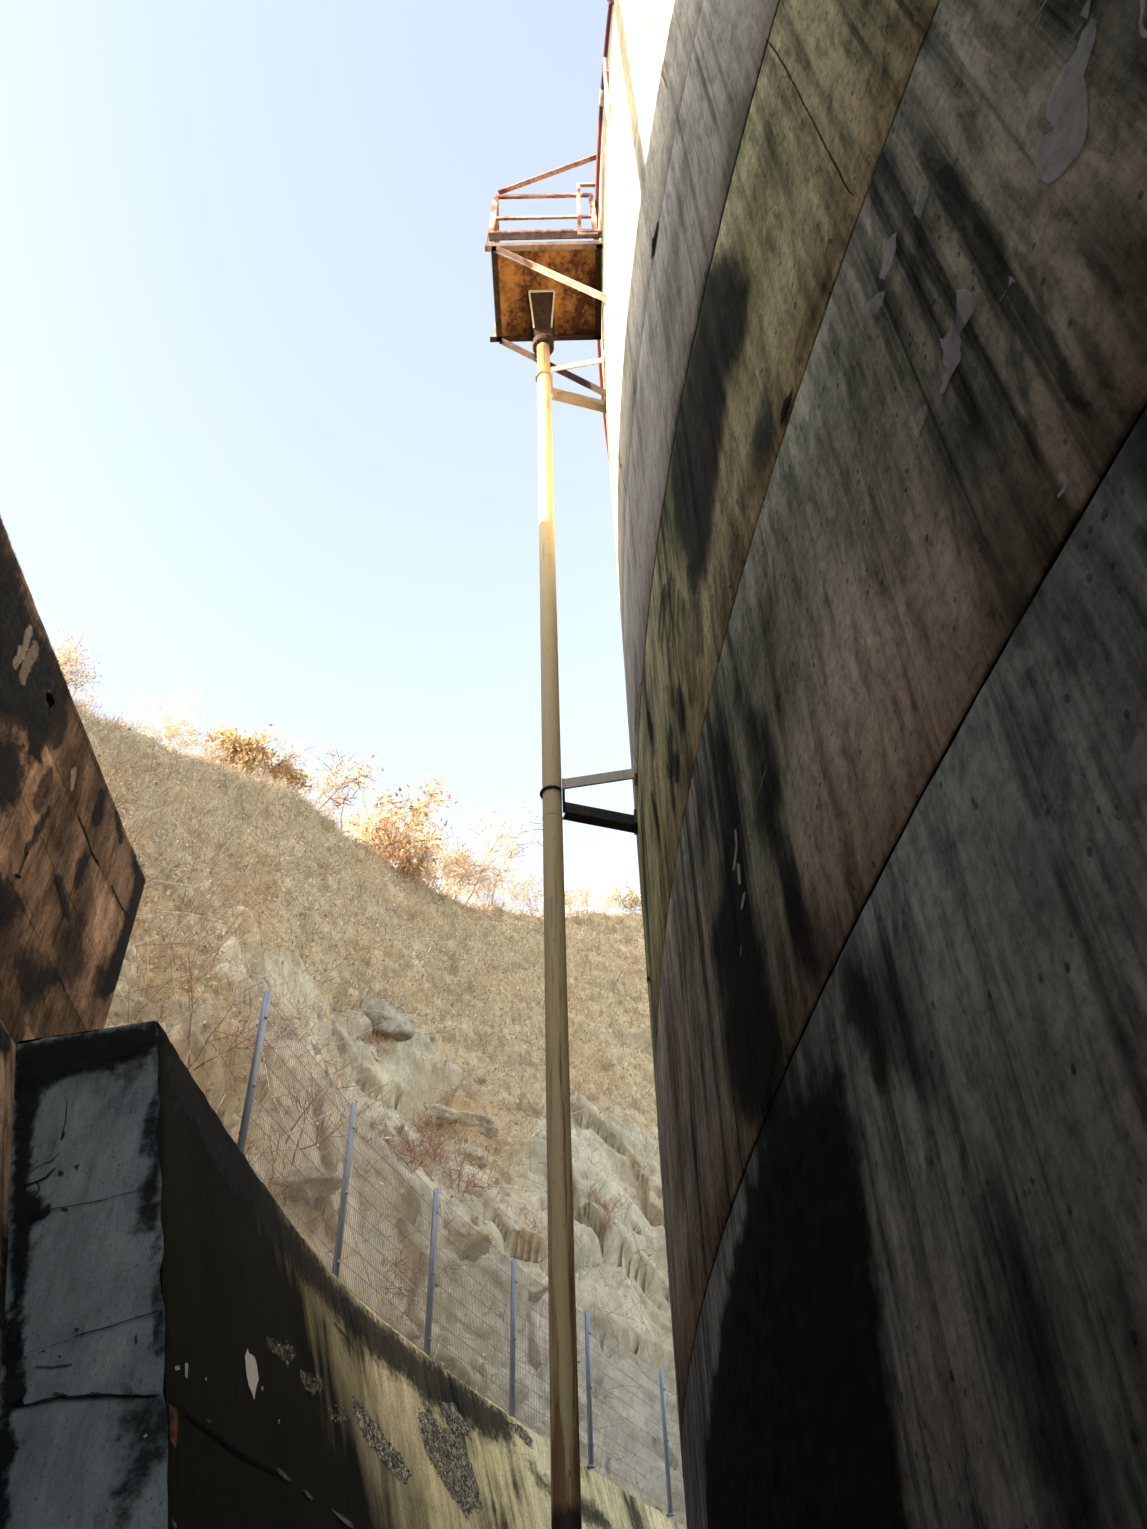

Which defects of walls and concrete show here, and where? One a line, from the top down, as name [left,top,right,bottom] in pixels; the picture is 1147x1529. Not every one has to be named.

peeling [1036,0,1097,184]
damp [0,514,69,815]
damp [24,807,50,856]
damp [0,872,24,930]
damp [55,851,89,919]
damp [92,788,146,996]
damp [8,945,58,1008]
peeling [245,1349,259,1399]